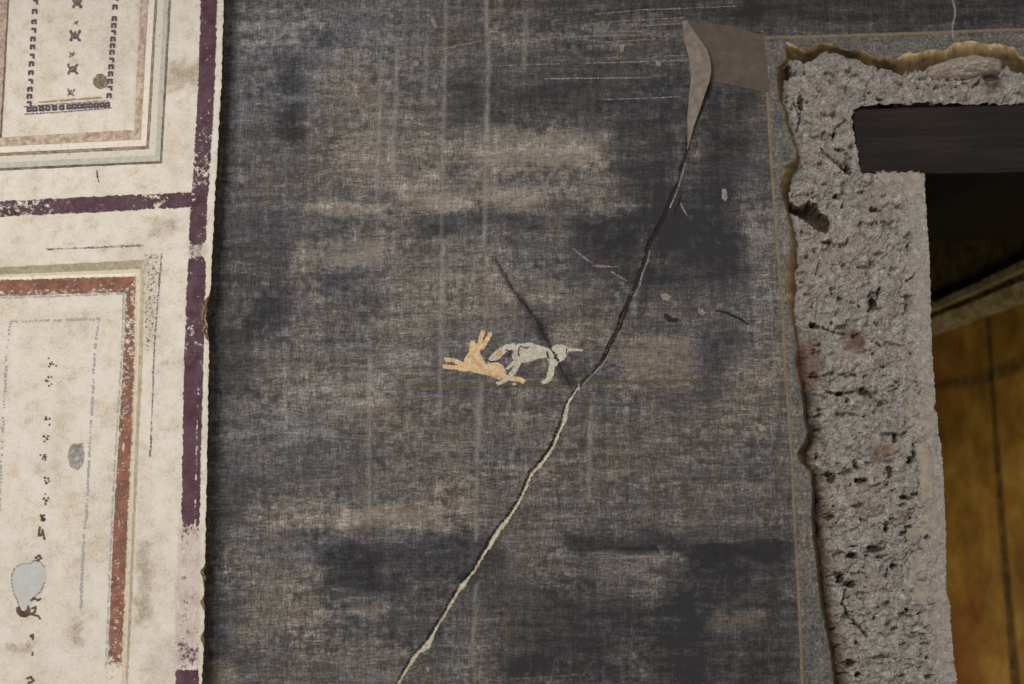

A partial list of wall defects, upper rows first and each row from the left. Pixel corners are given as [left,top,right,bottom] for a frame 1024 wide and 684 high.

crack [396,137,690,684]
flaking render [686,19,1024,684]